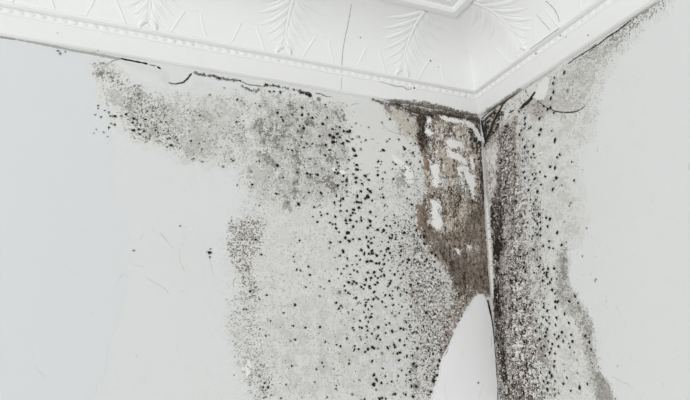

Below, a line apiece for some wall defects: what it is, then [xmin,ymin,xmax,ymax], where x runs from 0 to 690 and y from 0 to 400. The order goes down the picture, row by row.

crack [0,4,352,97]
crack [405,1,660,147]
flaking render [388,105,549,400]